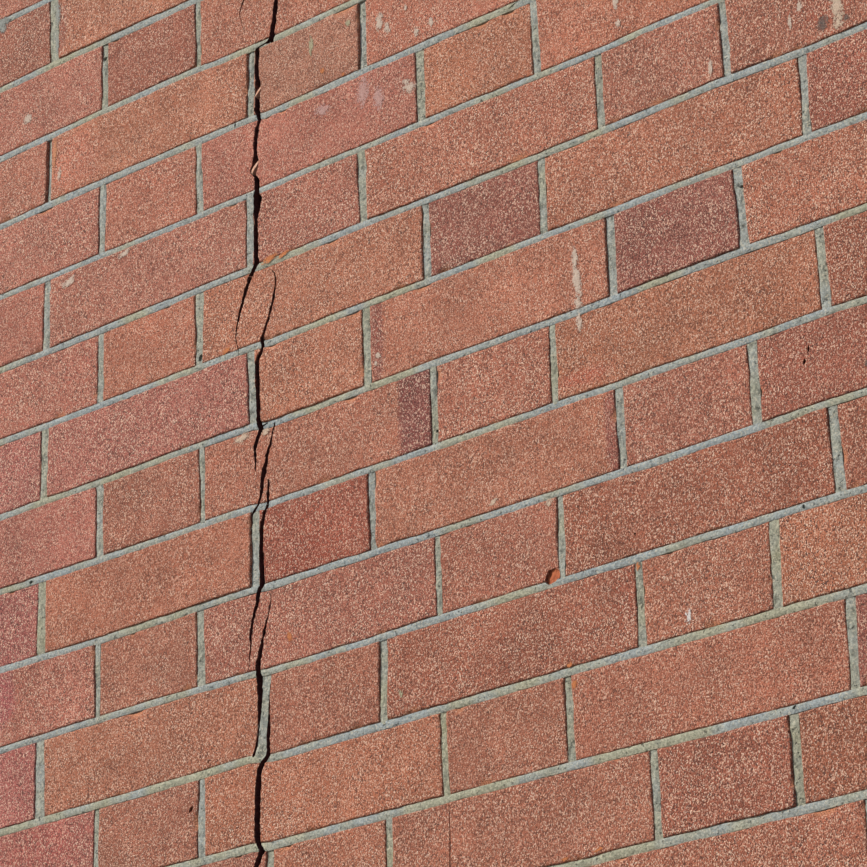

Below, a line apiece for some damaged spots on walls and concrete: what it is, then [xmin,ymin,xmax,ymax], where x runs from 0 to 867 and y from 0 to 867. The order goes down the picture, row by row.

crack [236,0,278,867]